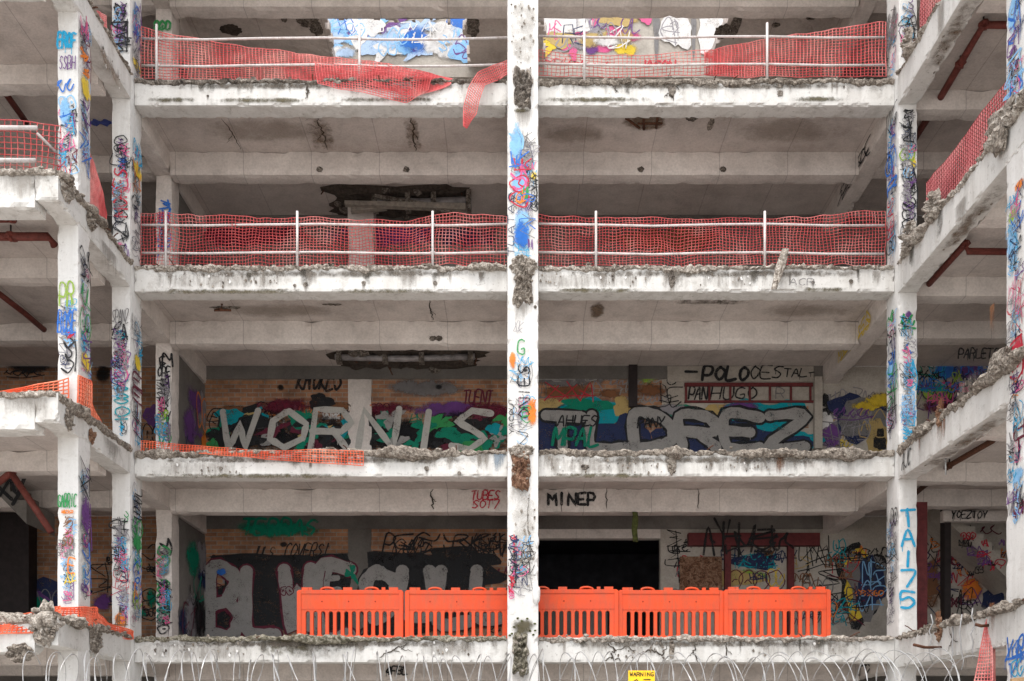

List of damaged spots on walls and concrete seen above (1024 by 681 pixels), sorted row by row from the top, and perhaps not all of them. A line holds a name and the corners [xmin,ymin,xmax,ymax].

spalling [88,0,941,109]
crack [305,84,327,148]
spalling [0,87,1024,308]
spalling [326,335,490,375]
spalling [0,345,1024,589]
spalling [0,598,1024,677]